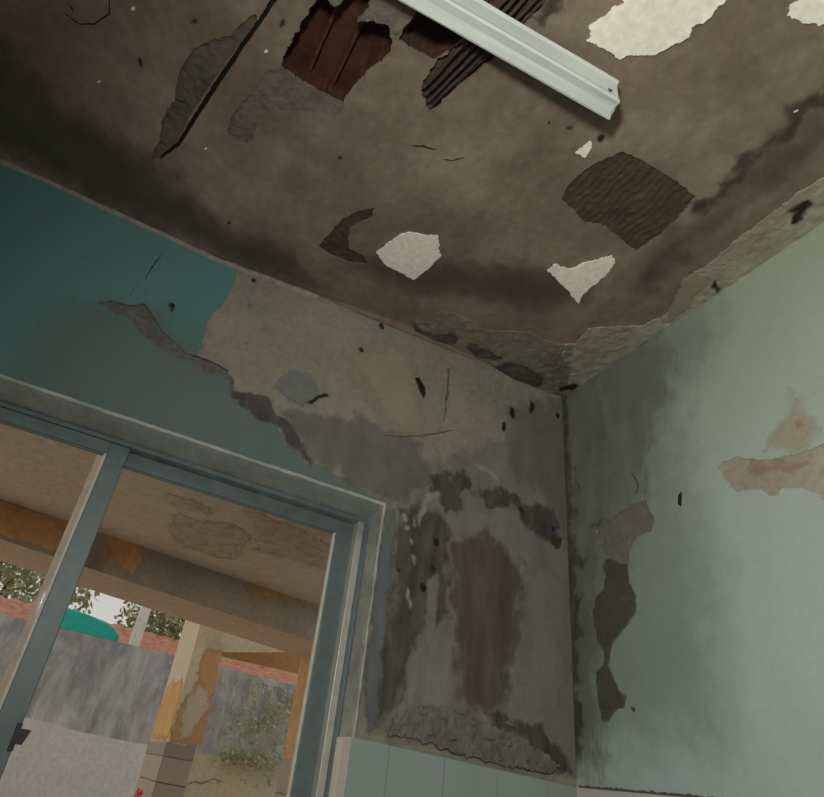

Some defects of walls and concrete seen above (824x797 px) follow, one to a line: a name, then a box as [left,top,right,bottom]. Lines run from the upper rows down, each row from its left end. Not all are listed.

spalling [153,14,257,158]
crack [160,0,277,158]
spalling [281,0,494,109]
spalling [484,0,561,24]
peeling [586,0,726,60]
peeling [787,0,824,26]
peeling [575,141,592,158]
spalling [562,152,695,251]
peeling [99,177,824,787]
water stain [378,345,666,772]